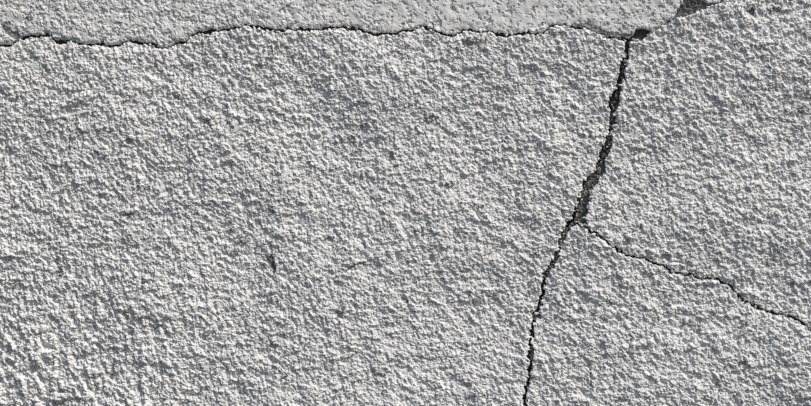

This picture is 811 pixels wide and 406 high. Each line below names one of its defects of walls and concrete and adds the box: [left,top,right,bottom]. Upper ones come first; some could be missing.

crack [0,23,811,331]
crack [522,247,561,406]